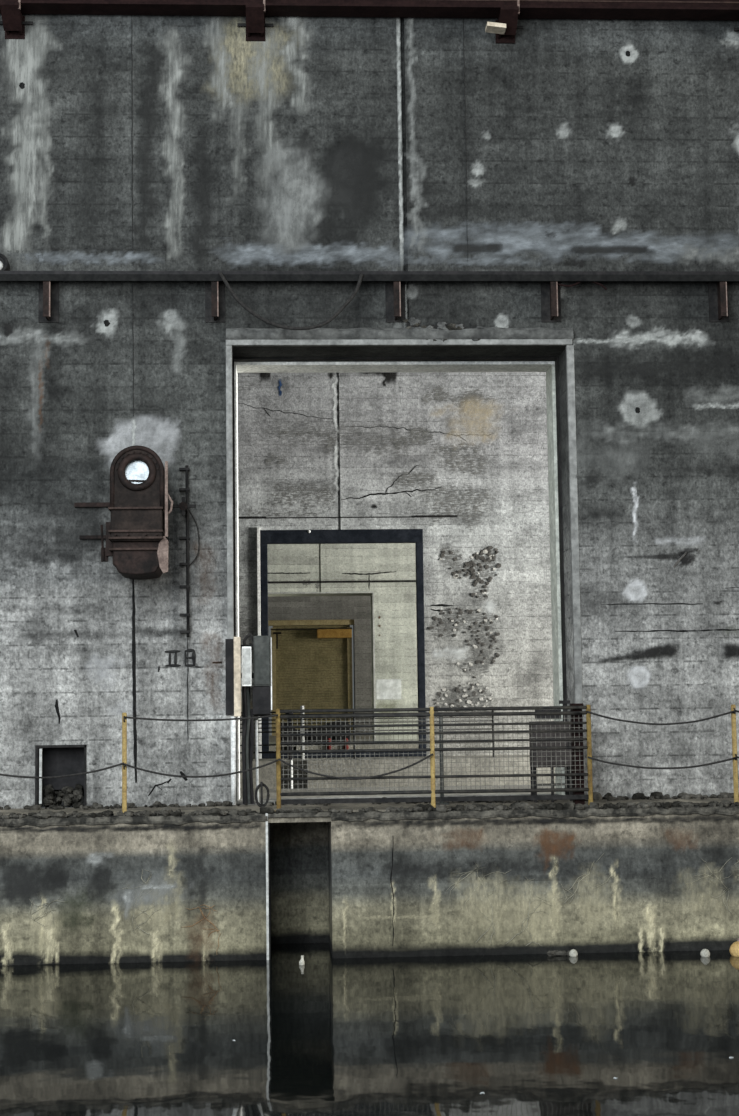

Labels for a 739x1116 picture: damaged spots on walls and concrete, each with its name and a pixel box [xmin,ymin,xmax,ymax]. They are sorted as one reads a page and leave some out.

damp [3,29,55,261]
damp [134,32,187,258]
damp [207,21,233,117]
damp [236,16,739,263]
peeling [428,546,502,717]
damp [39,919,59,961]
damp [90,854,176,962]
damp [638,907,664,952]